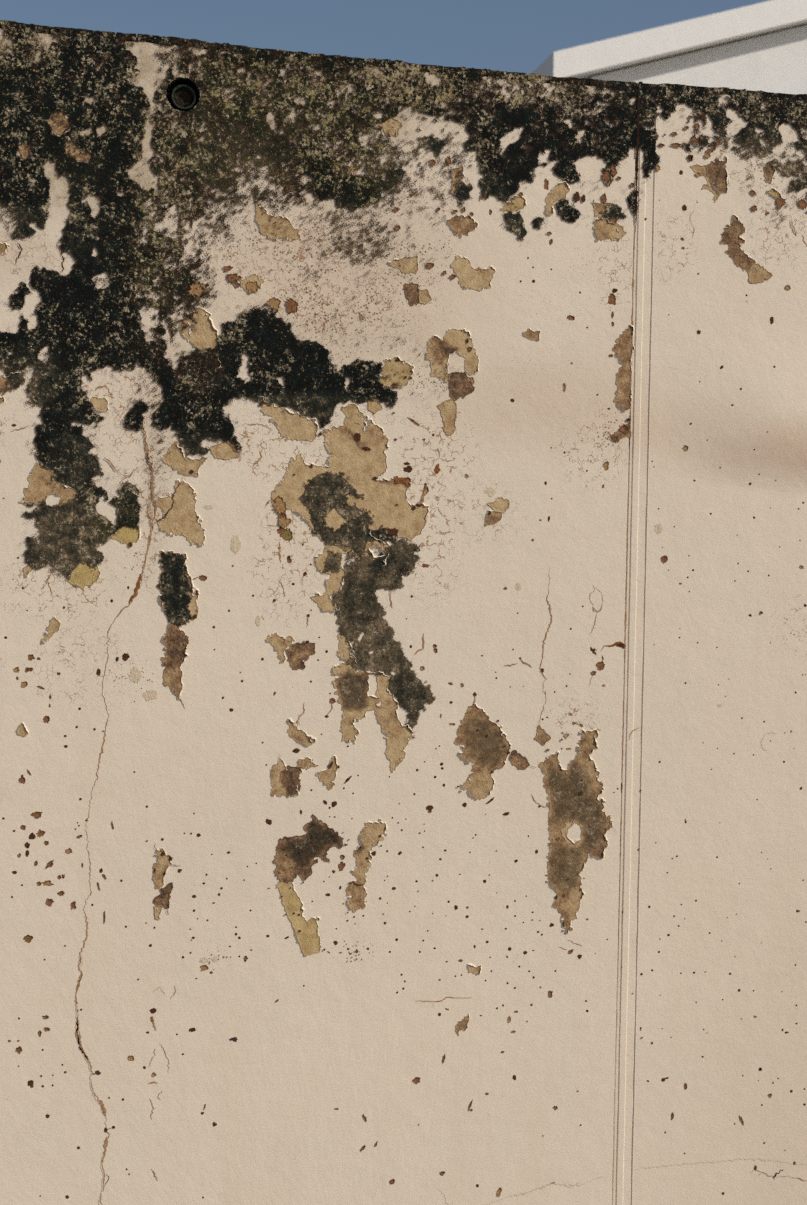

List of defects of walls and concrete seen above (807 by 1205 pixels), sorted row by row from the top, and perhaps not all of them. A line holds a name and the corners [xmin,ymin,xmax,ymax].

leakage [0,118,807,580]
peeling [388,255,496,306]
peeling [437,192,527,239]
peeling [608,288,635,443]
peeling [719,214,773,284]
peeling [122,440,241,700]
peeling [256,328,480,773]
crack [75,377,157,1205]
peeling [152,848,182,920]
peeling [270,718,352,807]
peeling [273,814,388,957]
peeling [453,703,613,934]